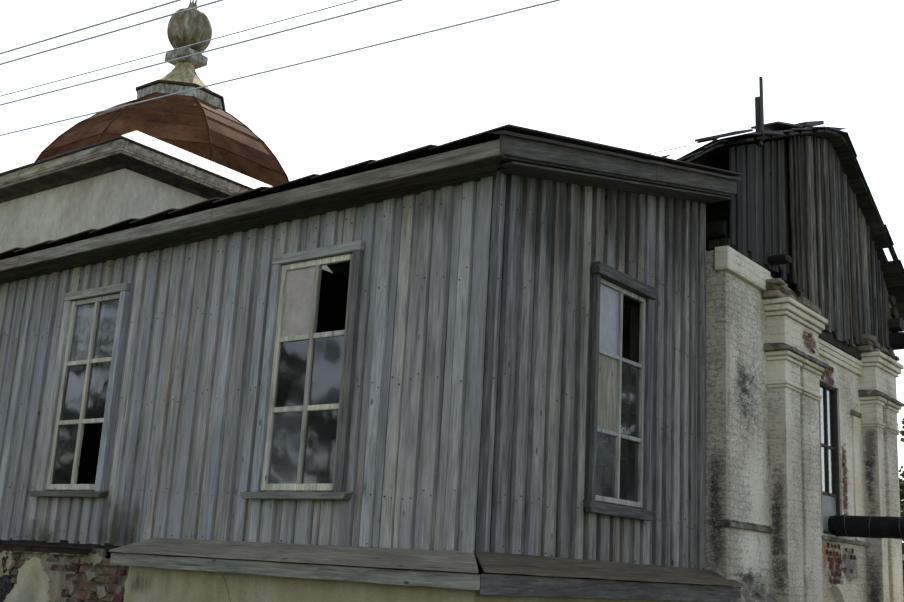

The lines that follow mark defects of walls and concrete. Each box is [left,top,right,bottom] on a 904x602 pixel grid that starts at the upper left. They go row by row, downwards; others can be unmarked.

spalling [802,330,816,354]
spalling [821,366,835,387]
water stain [773,478,785,589]
spalling [0,544,129,602]
spalling [826,543,856,586]